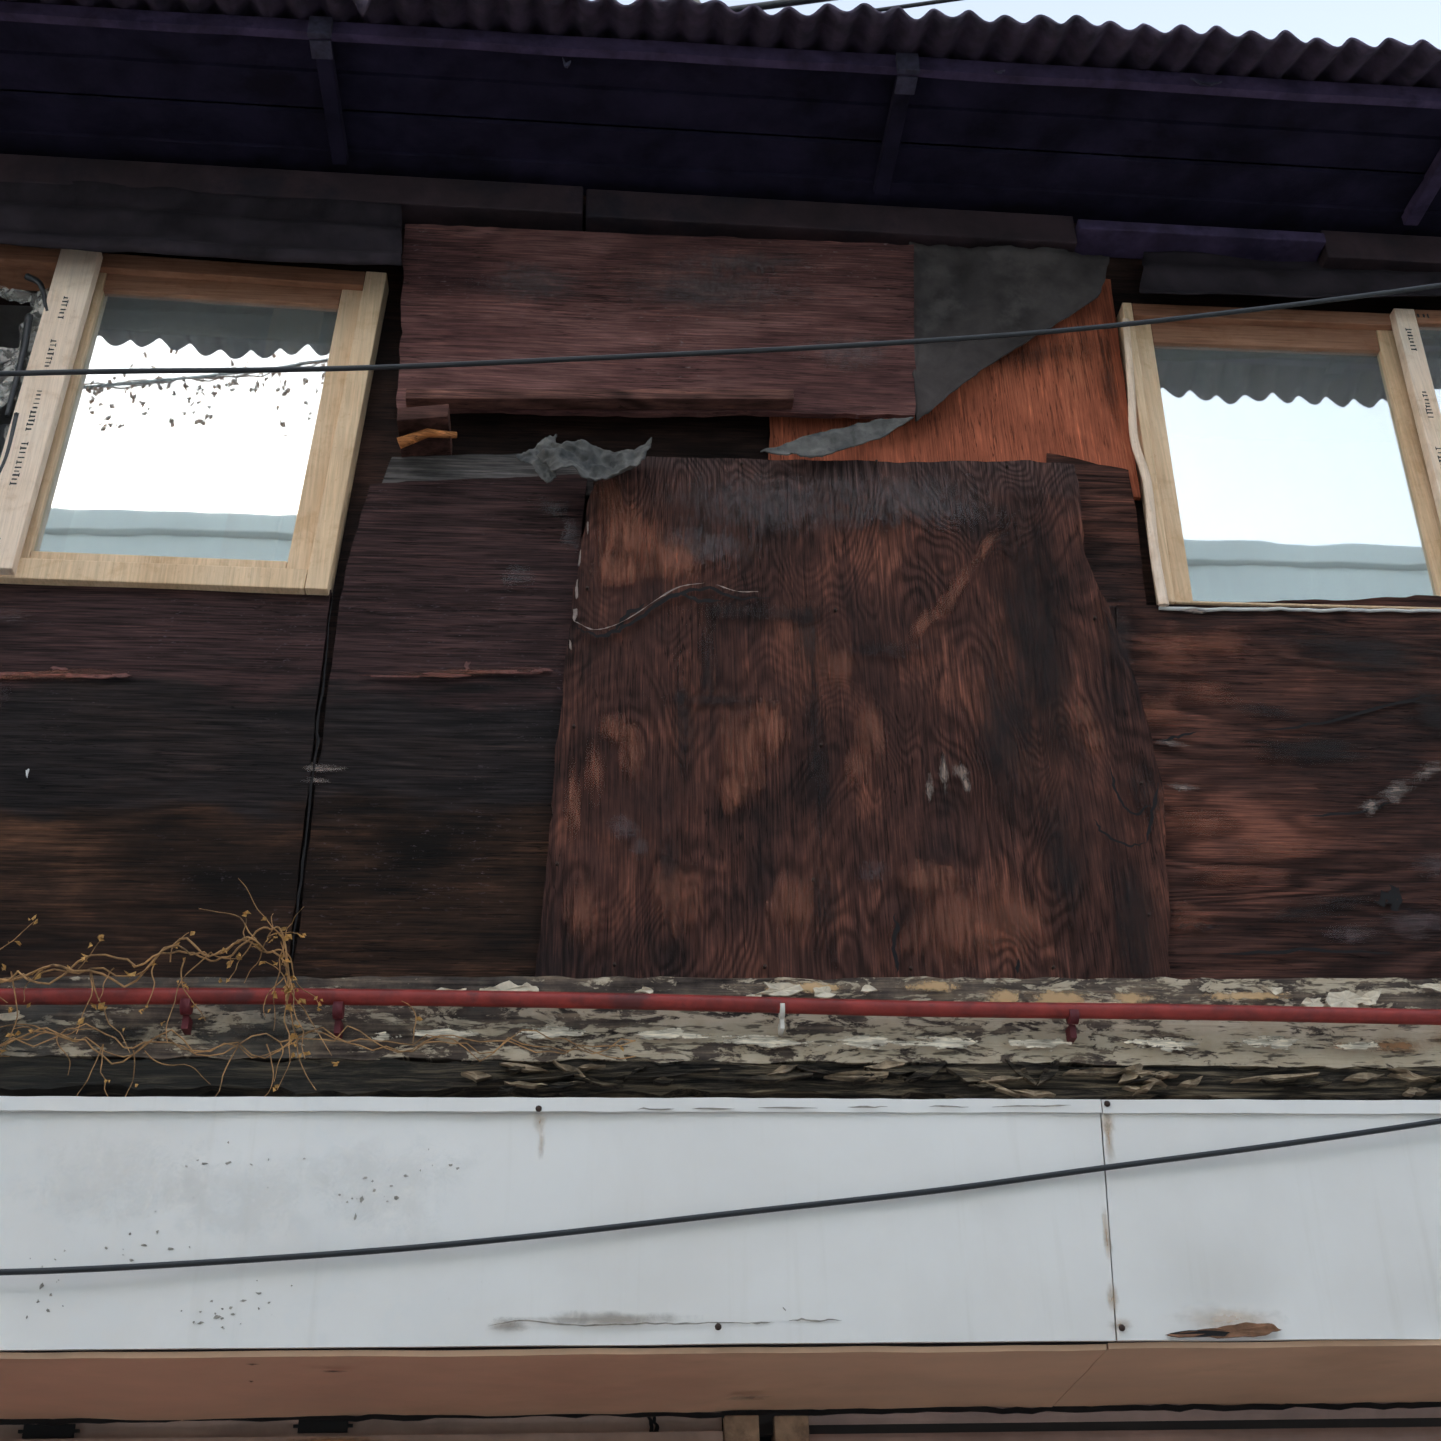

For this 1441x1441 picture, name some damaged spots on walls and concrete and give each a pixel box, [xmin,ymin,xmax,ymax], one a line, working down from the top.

peeling [437,981,539,991]
peeling [746,982,839,999]
peeling [906,981,956,991]
peeling [1212,987,1283,1000]
peeling [1301,989,1382,1008]
peeling [1416,983,1441,992]
peeling [372,1027,479,1042]
peeling [517,1026,587,1039]
peeling [636,1028,979,1050]
peeling [1008,1037,1072,1052]
peeling [1118,1037,1199,1052]
rust [1166,1322,1281,1339]